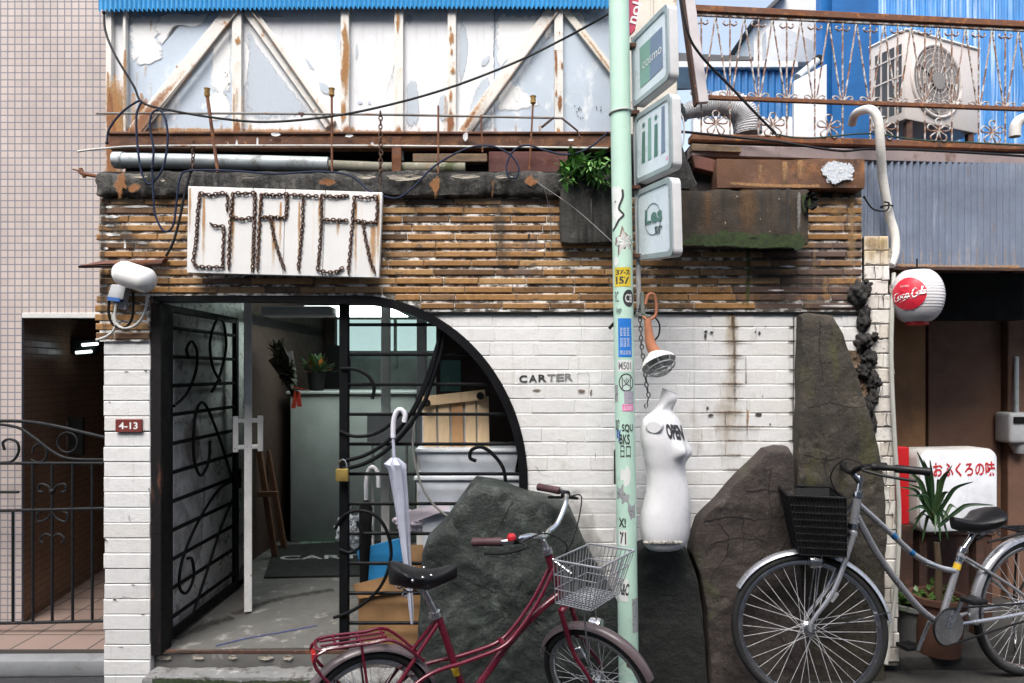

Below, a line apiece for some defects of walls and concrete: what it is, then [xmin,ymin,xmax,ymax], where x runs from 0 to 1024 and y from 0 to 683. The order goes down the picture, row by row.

peeling [129,13,208,65]
rust [105,23,403,197]
rust [444,91,486,131]
rust [734,162,819,187]